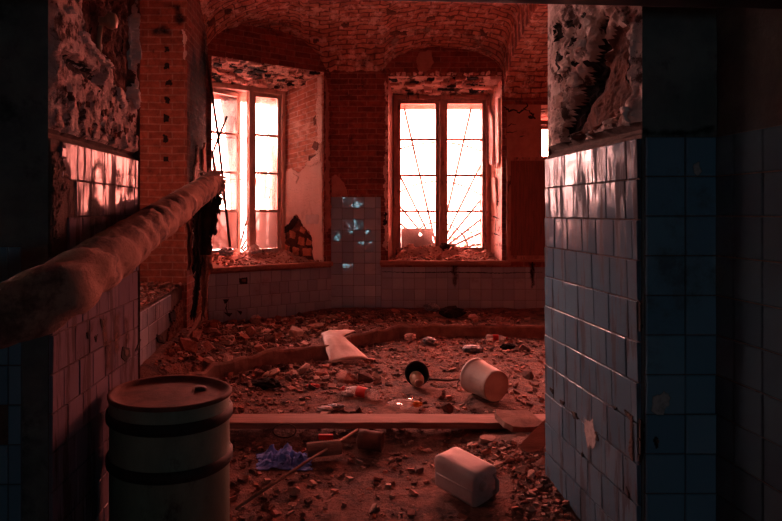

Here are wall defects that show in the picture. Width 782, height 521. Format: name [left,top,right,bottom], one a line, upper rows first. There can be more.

peeling [64,1,142,143]
peeling [212,57,348,262]
spalling [382,71,502,251]
crack [504,103,536,137]
flaking render [552,12,633,140]